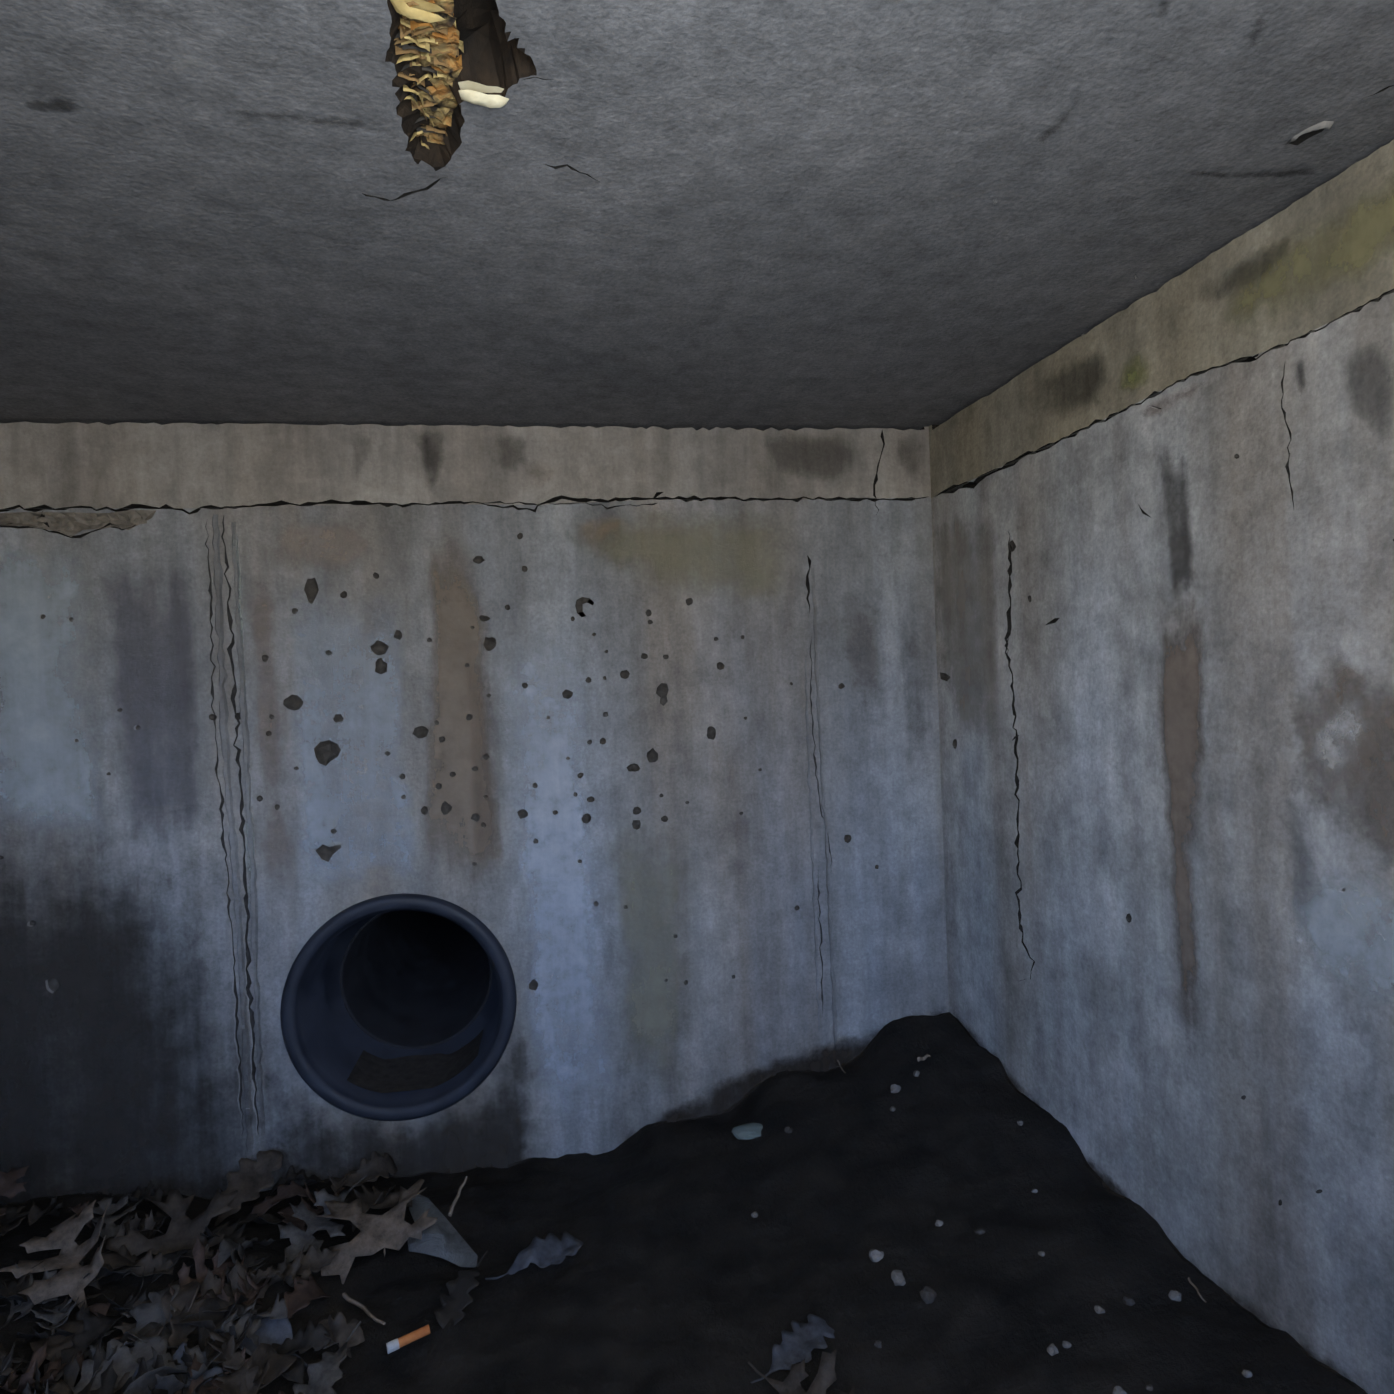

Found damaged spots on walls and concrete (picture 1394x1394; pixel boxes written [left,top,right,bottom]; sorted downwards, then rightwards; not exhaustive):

crack [362,177,447,201]
spalling [385,0,537,171]
water stain [1164,475,1190,585]
crack [0,289,1394,1135]
water stain [1161,619,1202,1016]
water stain [0,873,244,1205]